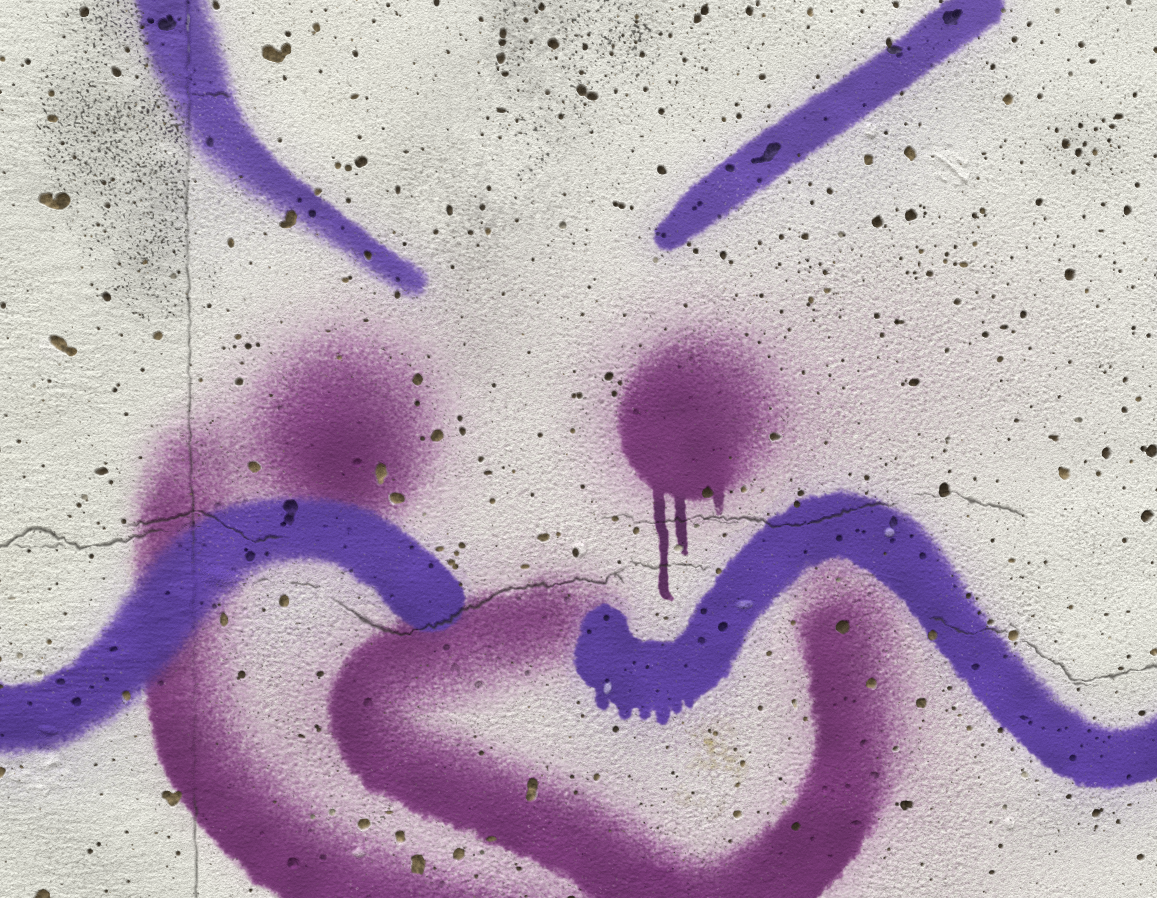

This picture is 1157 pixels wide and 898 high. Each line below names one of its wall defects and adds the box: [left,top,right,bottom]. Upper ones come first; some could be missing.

crack [0,509,290,553]
crack [598,490,1028,531]
crack [251,558,711,638]
crack [929,616,1157,688]